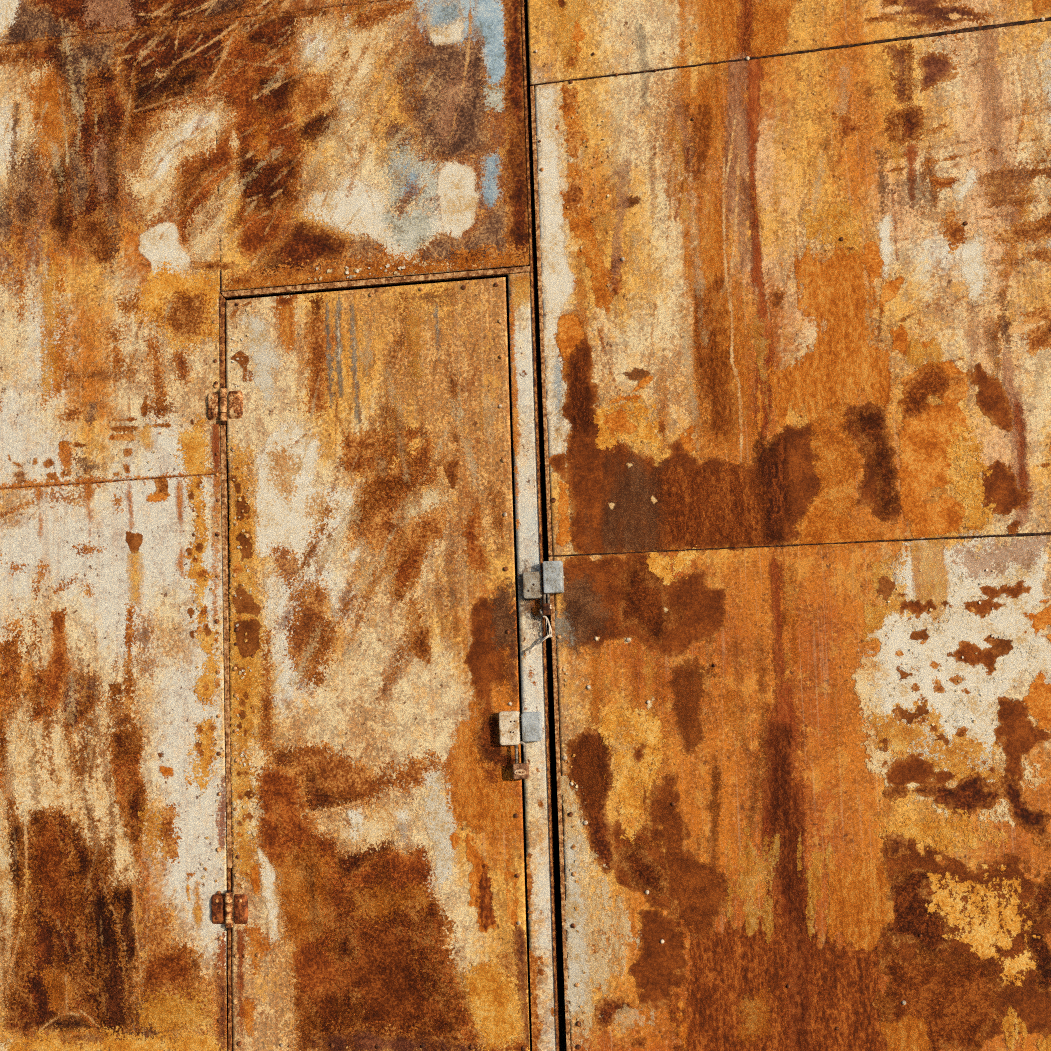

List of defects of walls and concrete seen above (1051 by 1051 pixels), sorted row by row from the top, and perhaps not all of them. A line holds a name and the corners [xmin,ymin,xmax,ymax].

rust [0,0,531,500]
rust [540,0,590,76]
rust [0,423,545,1051]
rust [548,0,1051,1051]
peeling [848,522,1051,829]